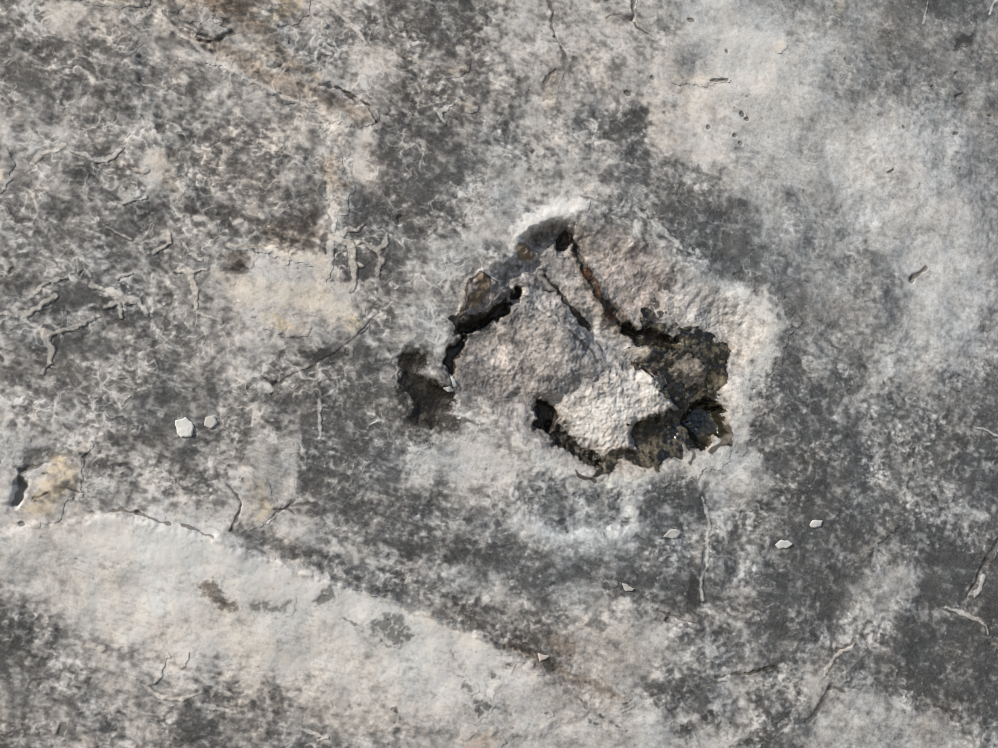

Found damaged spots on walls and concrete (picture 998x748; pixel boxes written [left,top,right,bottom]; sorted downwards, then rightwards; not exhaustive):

spalling [436,191,803,499]